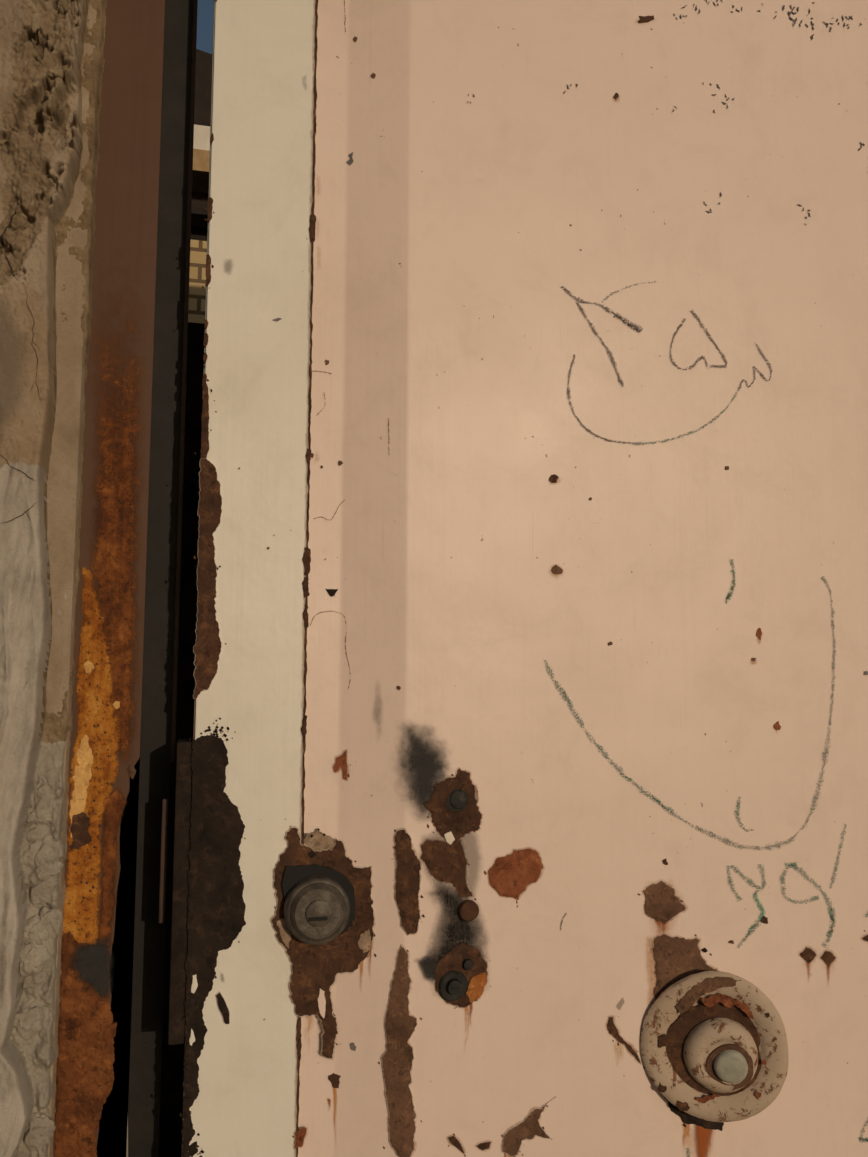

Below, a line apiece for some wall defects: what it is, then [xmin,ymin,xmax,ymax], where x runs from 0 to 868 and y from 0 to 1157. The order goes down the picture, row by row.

spalling [0,0,73,285]
corrosion [53,347,139,1157]
peeling [179,718,246,1157]
corrosion [271,826,377,1059]
corrosion [378,769,482,1157]
corrosion [435,942,491,1017]
corrosion [484,849,543,903]
corrosion [638,881,770,1019]
corrosion [327,1073,341,1122]
corrosion [477,1096,556,1157]
corrosion [658,1083,724,1157]